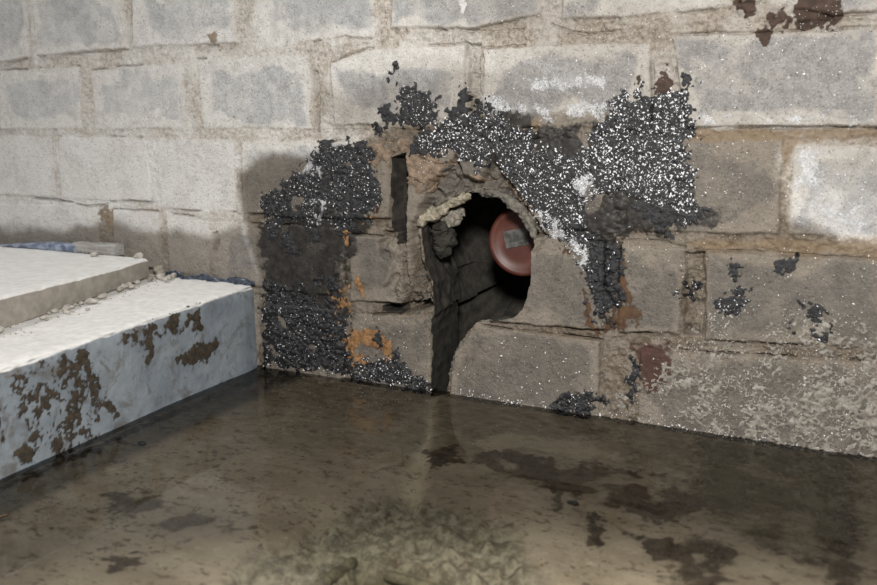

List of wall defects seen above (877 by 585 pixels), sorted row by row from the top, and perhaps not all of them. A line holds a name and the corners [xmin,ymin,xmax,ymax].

spalling [367,134,552,396]
corrosion [323,276,364,337]
corrosion [335,328,392,370]
water stain [421,433,714,525]
water stain [581,512,606,548]
water stain [622,531,737,585]